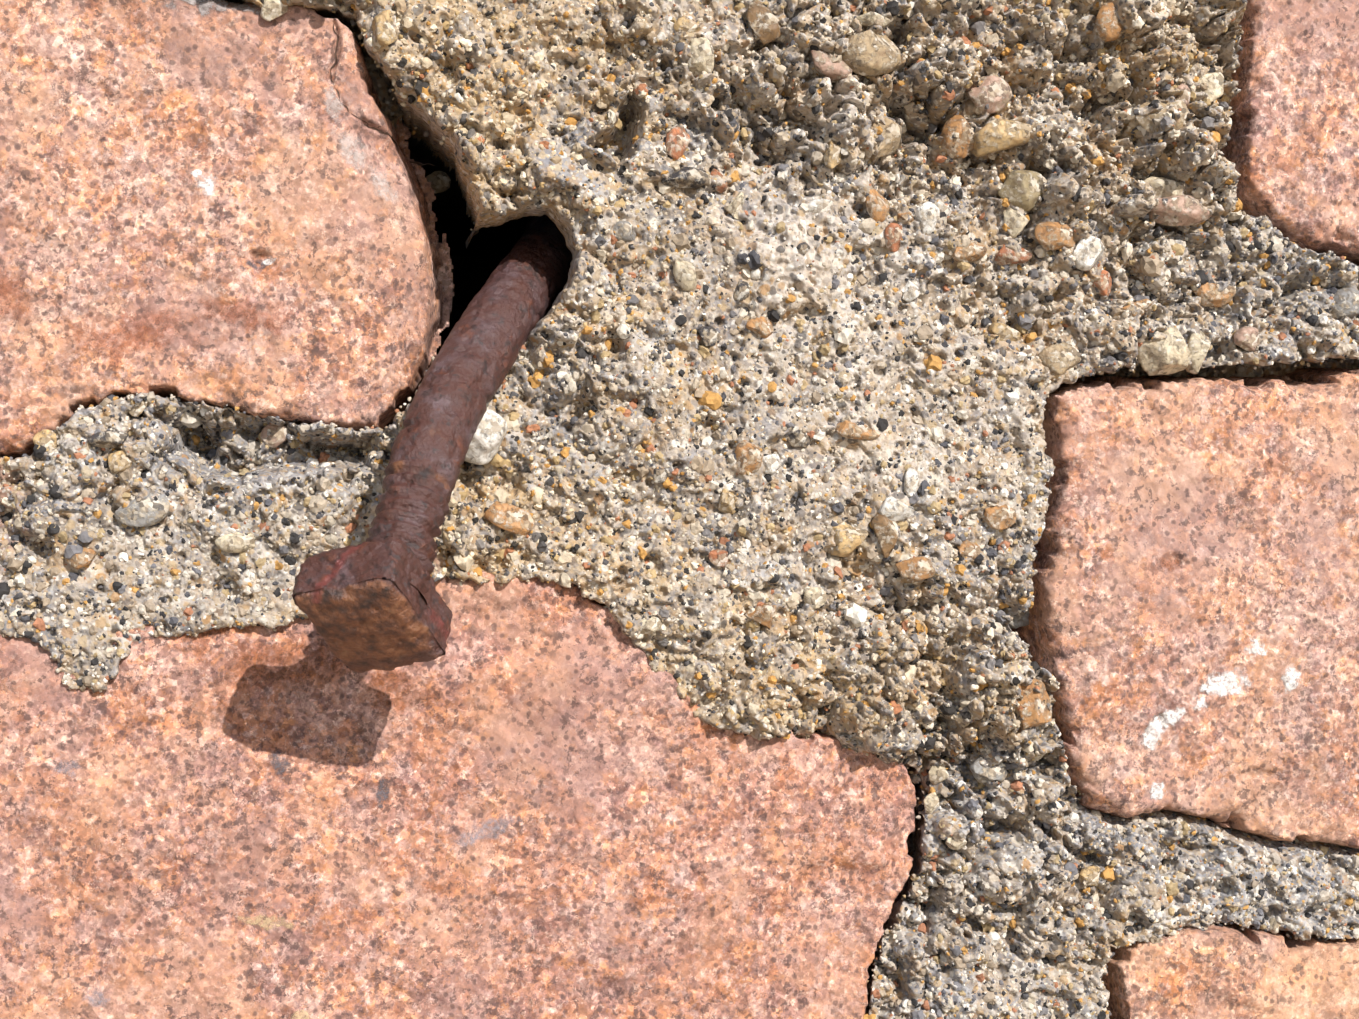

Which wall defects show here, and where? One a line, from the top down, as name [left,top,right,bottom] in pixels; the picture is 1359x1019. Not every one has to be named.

damp [1246,639,1266,656]
damp [1282,667,1301,691]
damp [1143,671,1251,750]
damp [1150,782,1164,800]